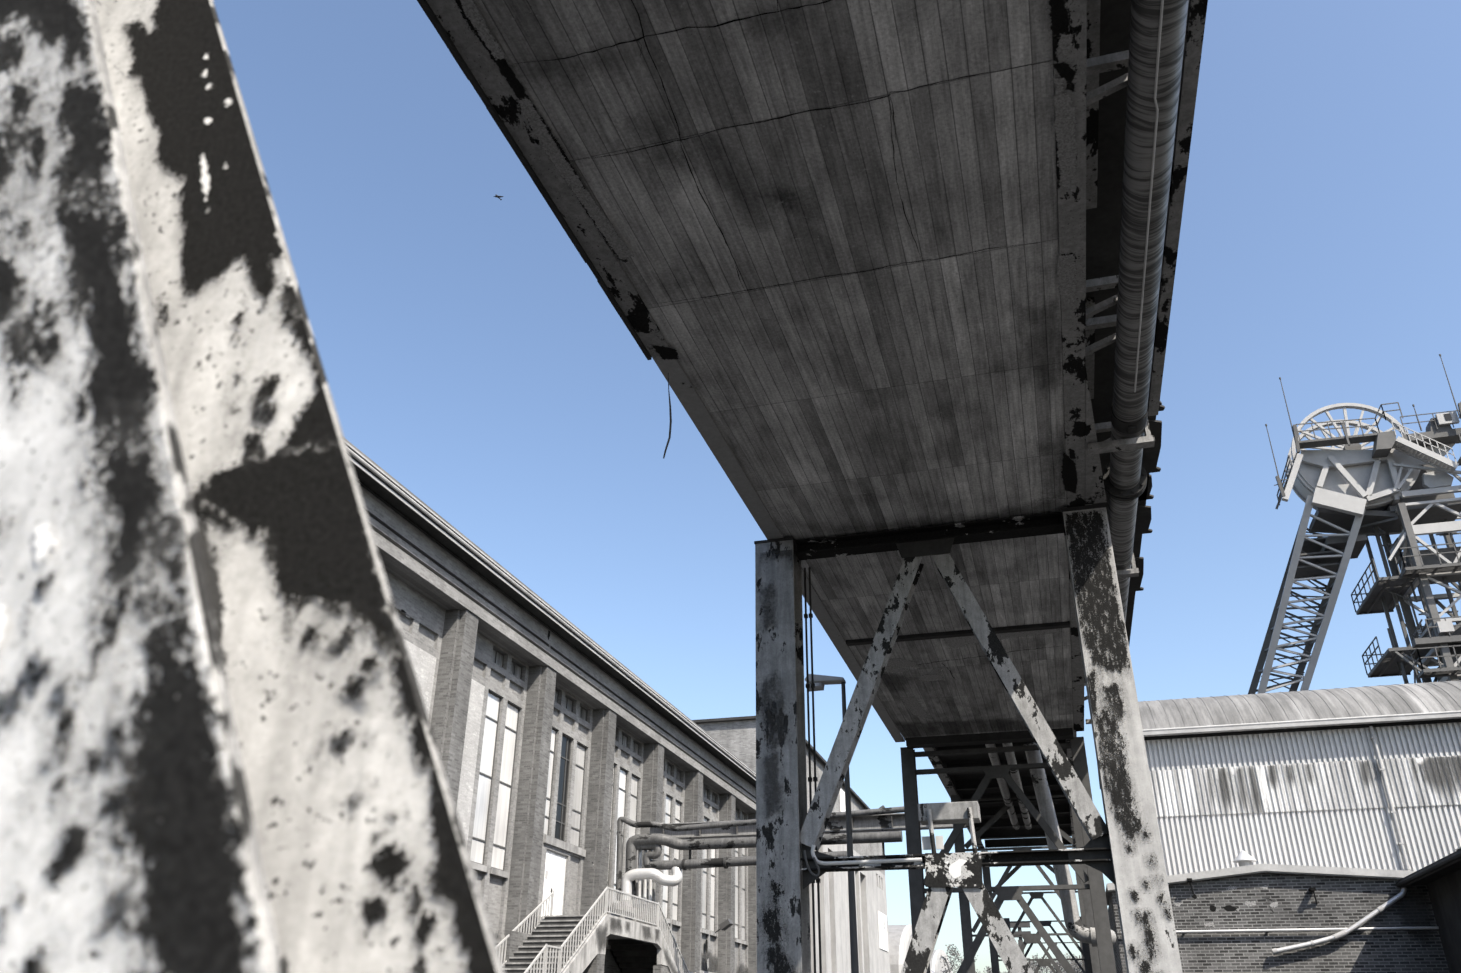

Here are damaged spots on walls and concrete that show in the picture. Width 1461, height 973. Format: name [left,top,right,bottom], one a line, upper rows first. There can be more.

spalling [461,0,505,60]
spalling [1056,33,1073,57]
peeling [199,154,228,212]
peeling [33,521,58,564]
peeling [191,498,229,686]
water stain [1208,765,1312,807]
water stain [1360,761,1378,782]
water stain [1412,756,1461,790]
peeling [278,945,289,973]